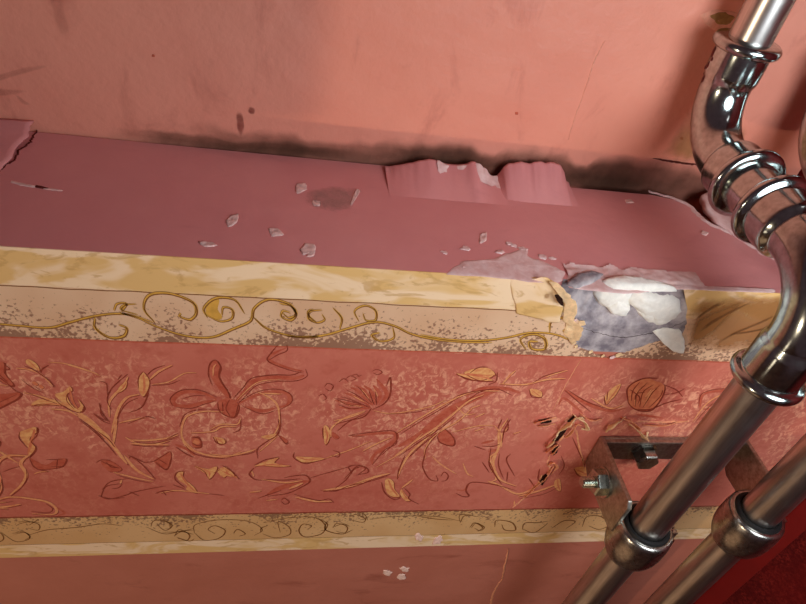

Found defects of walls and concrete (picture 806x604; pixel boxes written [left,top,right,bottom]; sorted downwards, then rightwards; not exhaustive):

peeling [0,118,38,170]
damp [444,152,466,164]
peeling [385,159,522,207]
spalling [699,192,741,241]
spalling [447,241,775,353]